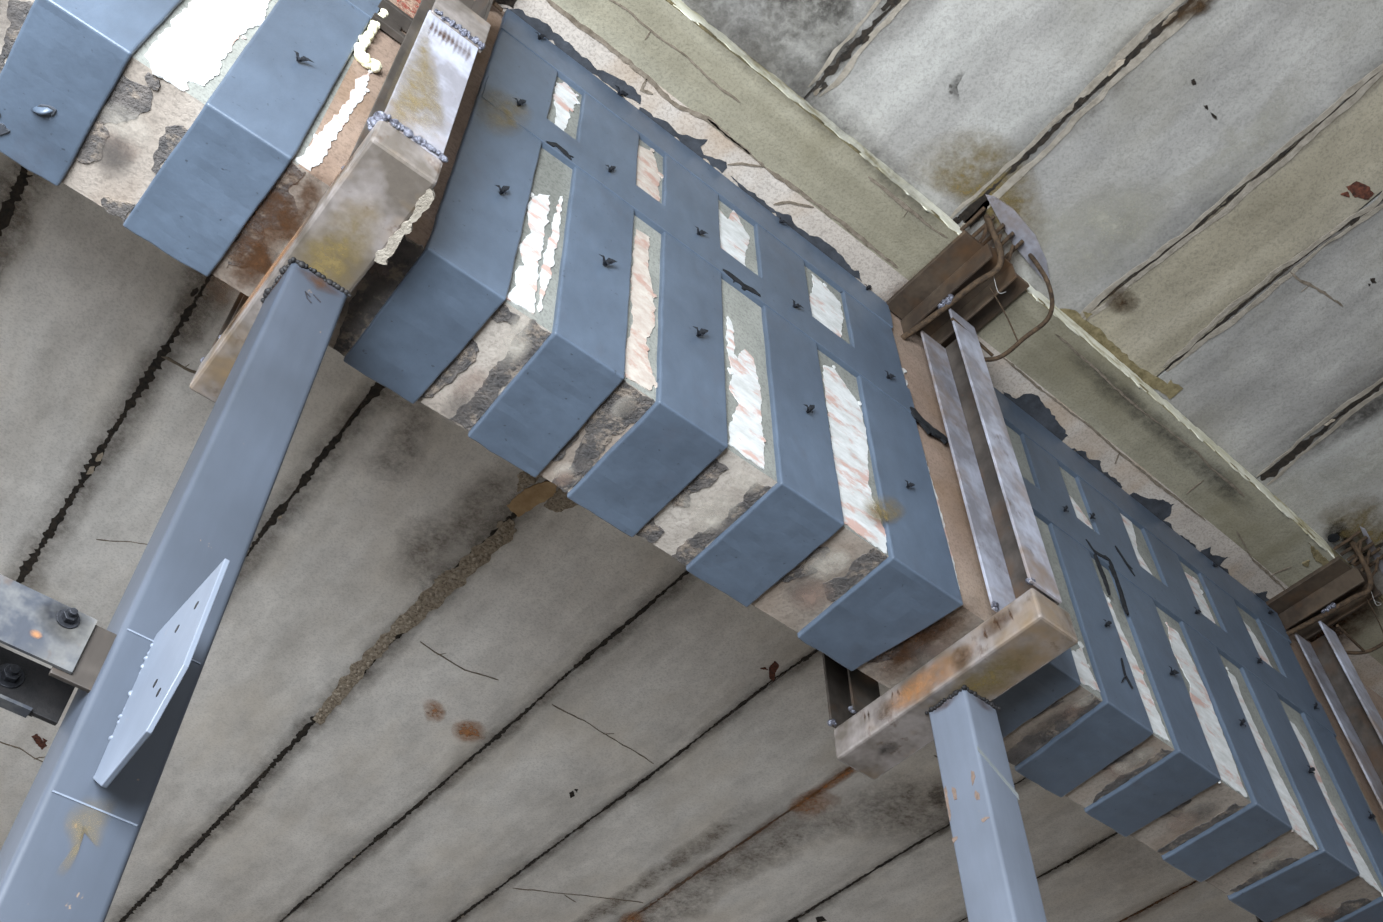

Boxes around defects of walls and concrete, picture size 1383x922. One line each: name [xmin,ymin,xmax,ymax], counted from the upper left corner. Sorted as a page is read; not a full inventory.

spalling [228,69,373,267]
spalling [313,229,657,725]
crack [455,512,517,568]
corrosion [458,723,480,739]
crack [280,570,852,922]
crack [119,716,317,922]
damp [582,825,727,922]
crack [795,823,950,919]
crack [1037,832,1118,878]